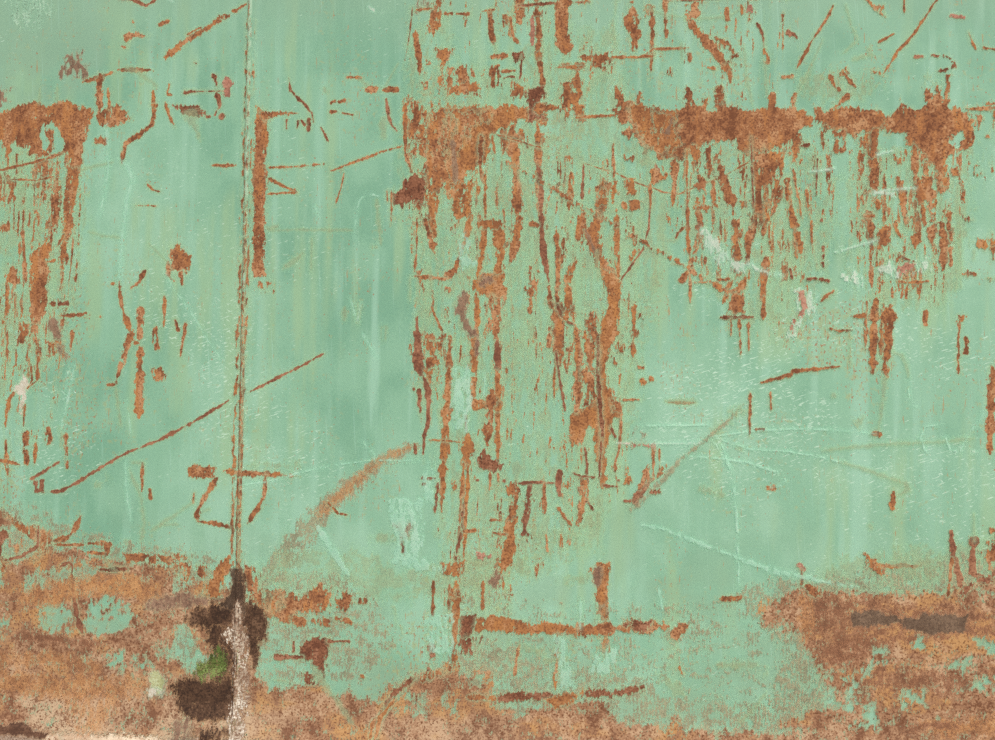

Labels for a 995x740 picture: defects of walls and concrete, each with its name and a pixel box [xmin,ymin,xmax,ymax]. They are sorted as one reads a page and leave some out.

rust [828,66,857,92]
rust [621,175,642,212]
rust [0,67,154,490]
rust [524,259,541,315]
rust [133,296,188,419]
rust [956,315,969,374]
rust [984,366,995,455]
damp [169,566,269,740]